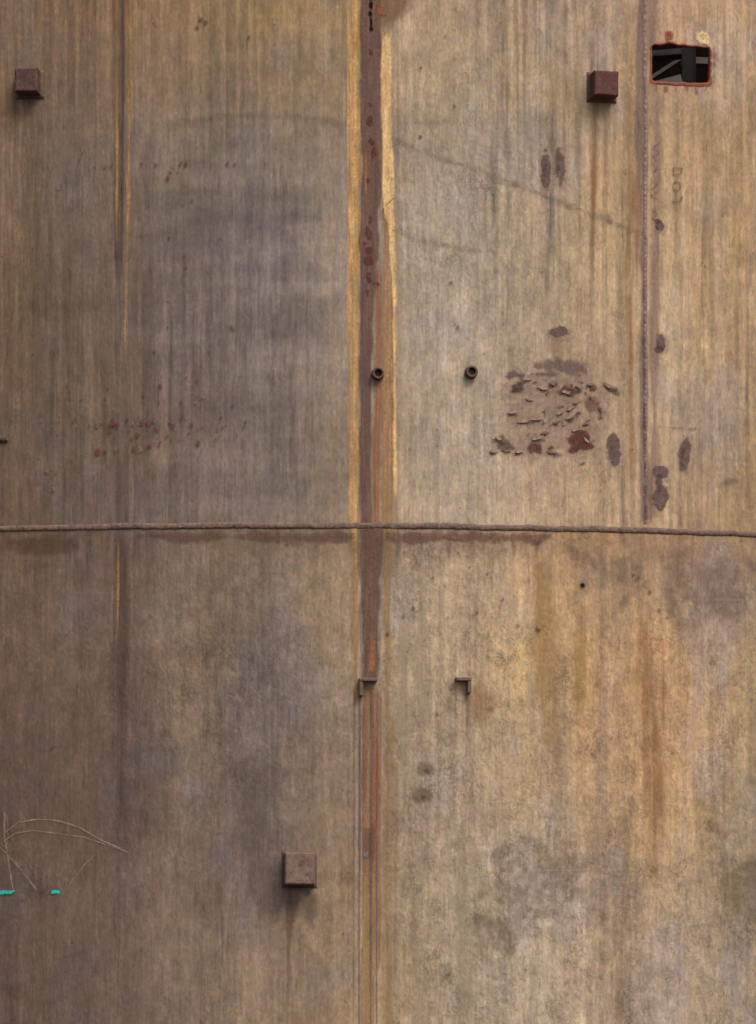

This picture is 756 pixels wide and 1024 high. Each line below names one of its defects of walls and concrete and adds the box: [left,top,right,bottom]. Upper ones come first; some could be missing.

rust [540,147,569,191]
rust [607,0,673,518]
peeling [491,360,620,464]
rust [678,438,695,471]
rust [242,0,550,1024]